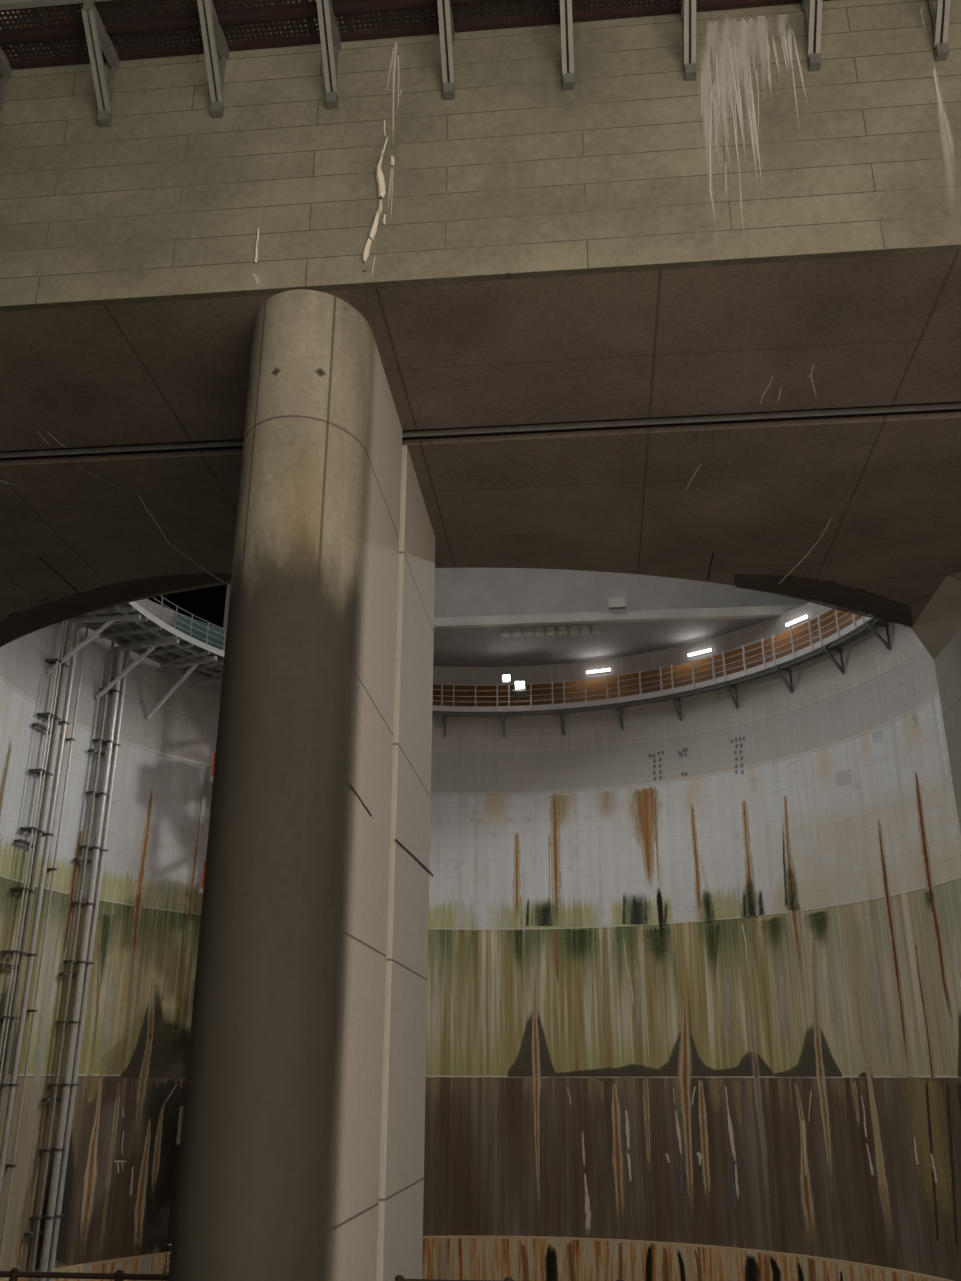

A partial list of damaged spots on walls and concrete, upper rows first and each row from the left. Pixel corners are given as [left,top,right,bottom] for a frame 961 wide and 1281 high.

efflorescence [701,14,805,223]
corrosion [81,1056,121,1234]
corrosion [135,980,165,1240]
corrosion [549,794,561,906]
leakage [582,1131,592,1230]
corrosion [632,786,658,877]
leakage [508,897,842,1209]
corrosion [784,797,832,1172]
leakage [861,1095,874,1175]
corrosion [878,822,905,1040]
corrosion [915,771,948,998]
leakage [914,1014,961,1245]